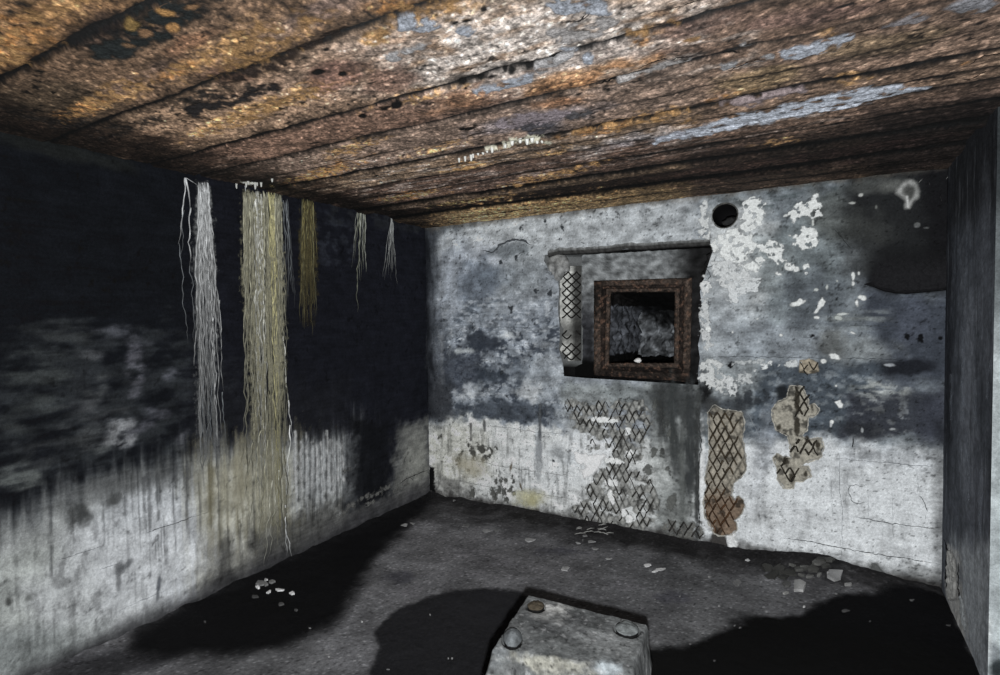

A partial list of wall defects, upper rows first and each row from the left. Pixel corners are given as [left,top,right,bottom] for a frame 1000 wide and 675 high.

leakage [130,178,430,658]
spalling [564,398,747,547]
spalling [697,193,840,490]